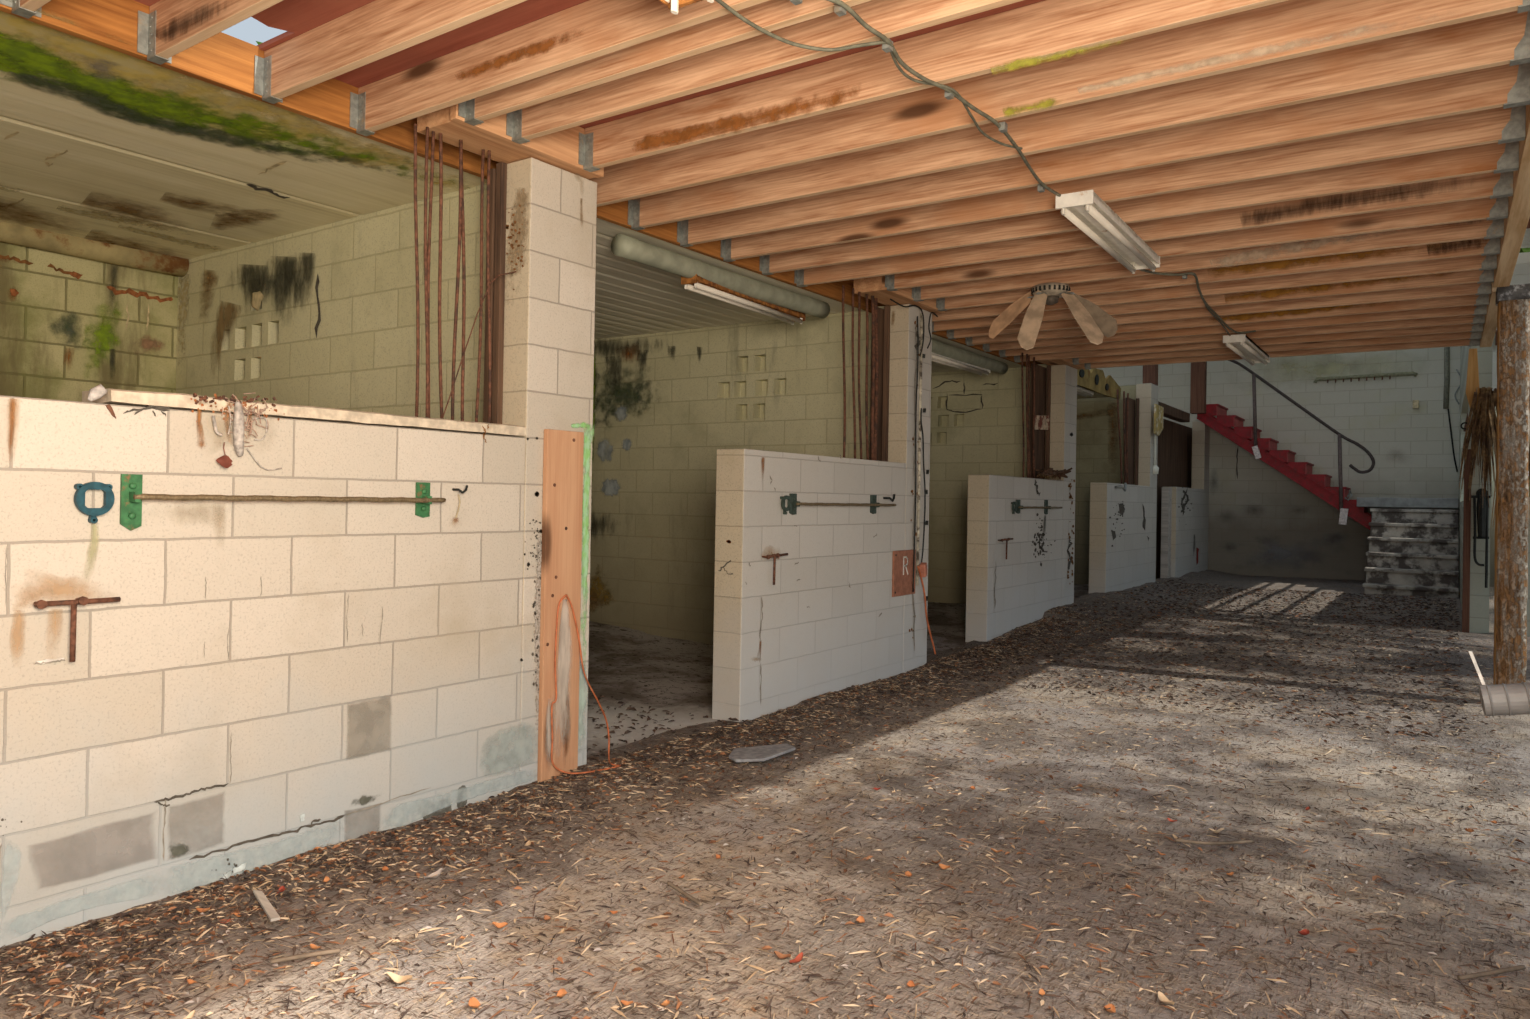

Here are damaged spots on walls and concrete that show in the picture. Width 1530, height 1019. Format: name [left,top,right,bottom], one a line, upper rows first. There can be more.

water stain [163,10,208,38]
water stain [242,253,321,338]
water stain [592,341,650,461]
water stain [591,516,605,534]
corrosion [13,615,22,649]